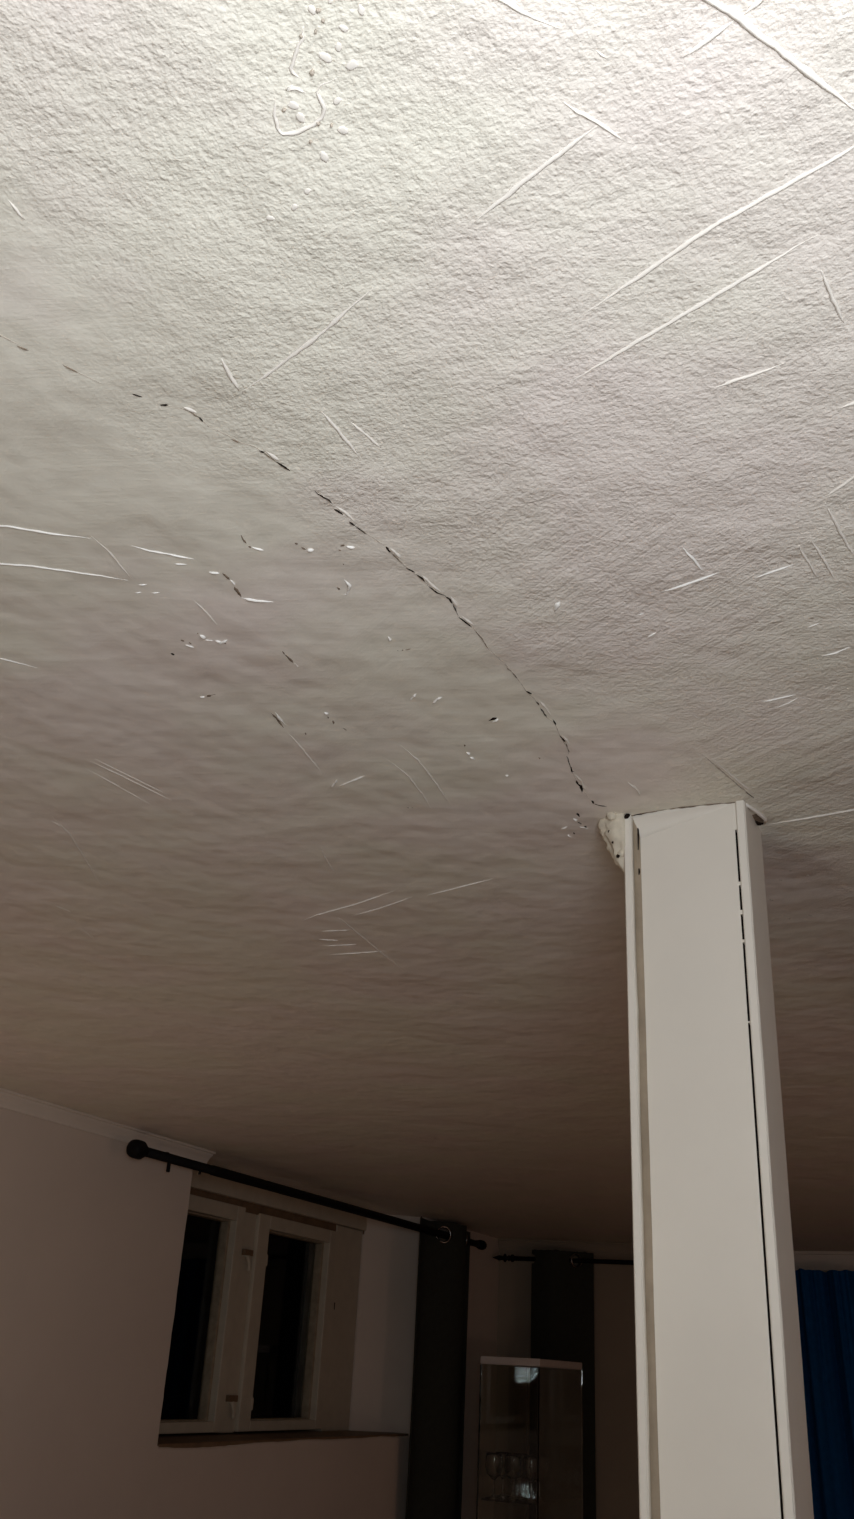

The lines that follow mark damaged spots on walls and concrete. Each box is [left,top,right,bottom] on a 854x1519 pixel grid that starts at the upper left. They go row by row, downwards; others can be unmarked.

crack [63,365,754,816]